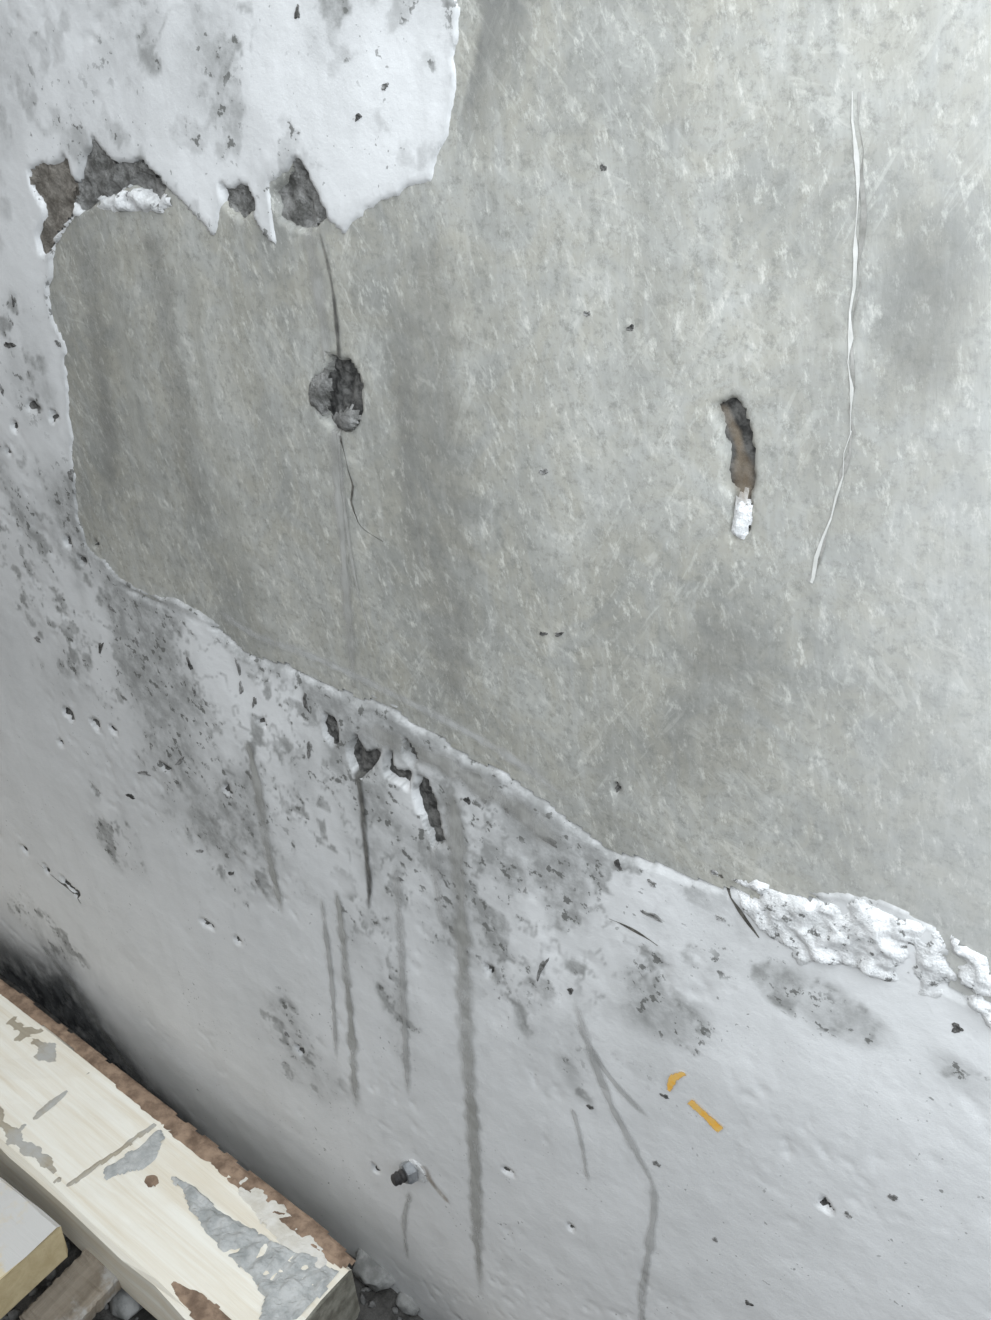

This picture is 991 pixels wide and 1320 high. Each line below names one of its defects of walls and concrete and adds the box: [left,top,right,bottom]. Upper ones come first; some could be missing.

crack [807,91,867,583]
crack [339,436,383,542]
spalling [29,0,991,1028]
water stain [246,744,265,822]
water stain [264,840,281,902]
water stain [355,768,371,904]
water stain [324,896,358,1097]
water stain [397,912,409,1084]
water stain [429,800,481,1273]
water stain [578,1013,646,1170]
water stain [639,1186,657,1320]